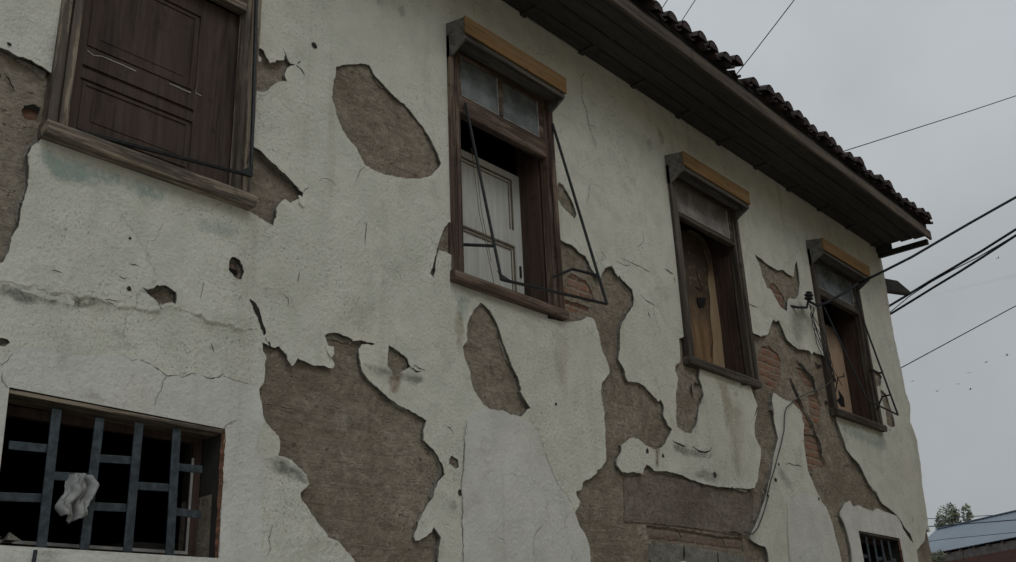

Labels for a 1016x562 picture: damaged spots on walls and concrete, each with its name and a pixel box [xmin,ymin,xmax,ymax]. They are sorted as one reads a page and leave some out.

spalling [0,42,49,263]
spalling [257,48,295,92]
spalling [249,147,306,225]
spalling [332,63,441,179]
spalling [144,285,177,306]
spalling [229,257,244,279]
spalling [259,333,459,562]
spalling [463,303,530,416]
spalling [548,240,932,562]